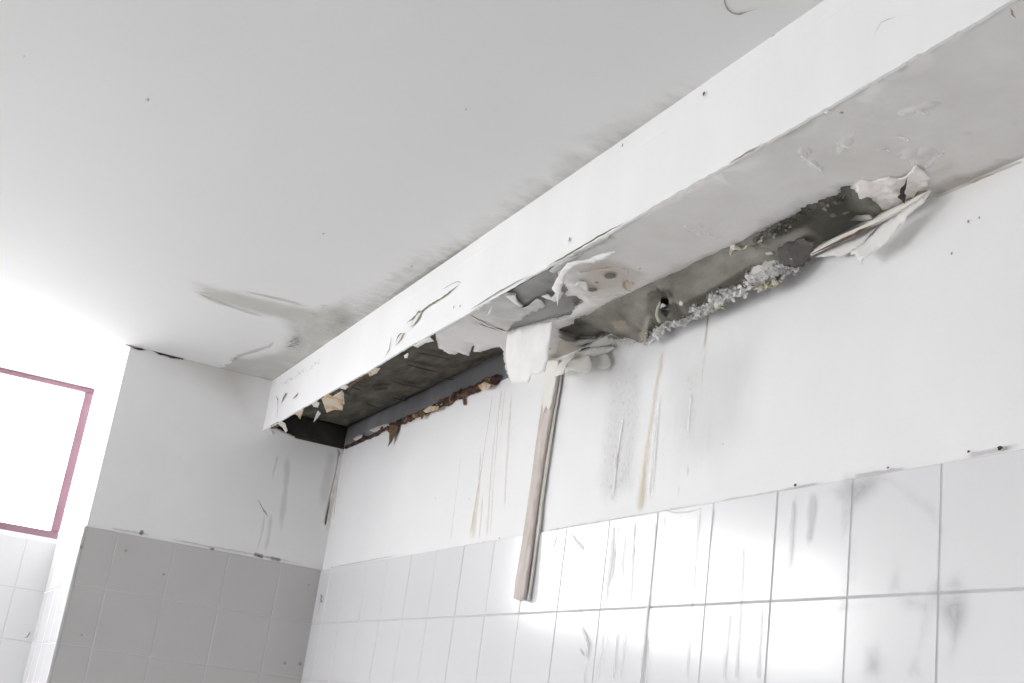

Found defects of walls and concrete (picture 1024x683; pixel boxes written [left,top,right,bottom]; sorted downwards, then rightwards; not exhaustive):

rust [344,374,501,449]
spalling [264,186,882,449]